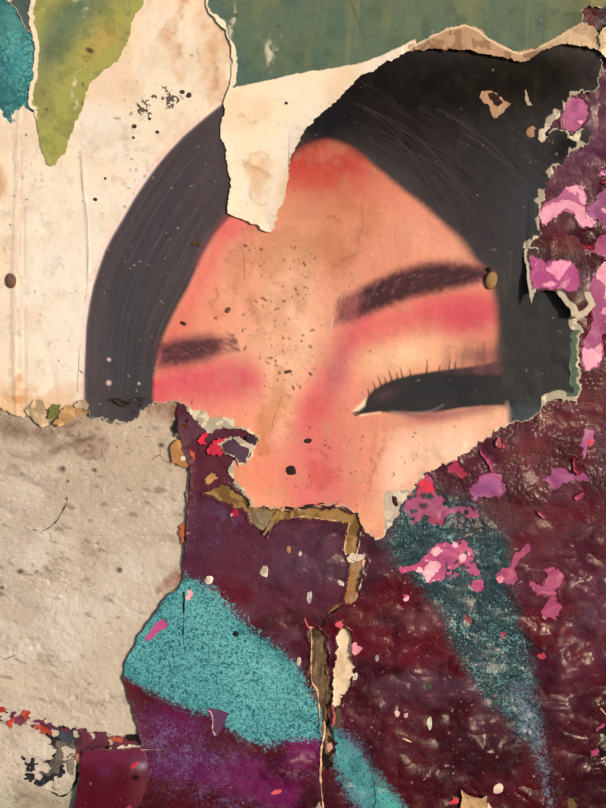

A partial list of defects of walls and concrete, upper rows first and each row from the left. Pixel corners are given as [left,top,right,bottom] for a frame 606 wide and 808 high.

peeling [561,97,589,133]
peeling [197,433,258,465]
peeling [0,401,195,808]
peeling [332,621,363,707]